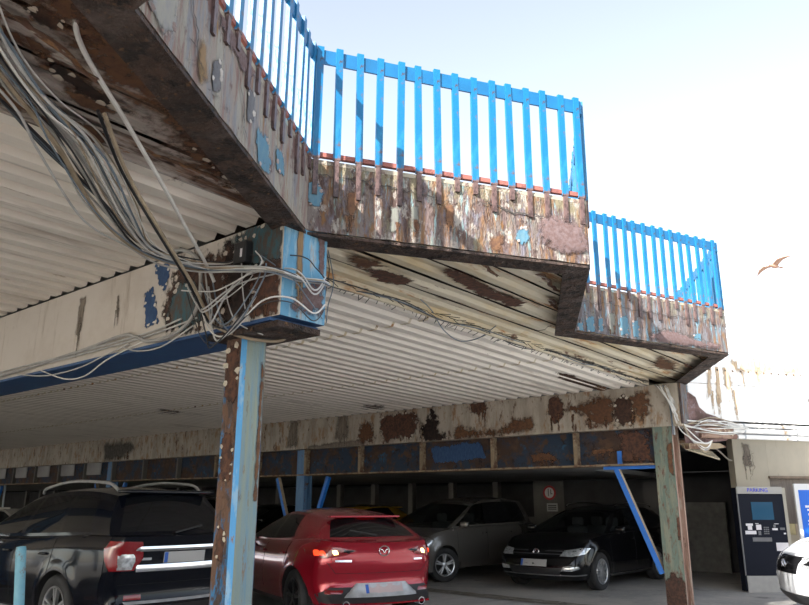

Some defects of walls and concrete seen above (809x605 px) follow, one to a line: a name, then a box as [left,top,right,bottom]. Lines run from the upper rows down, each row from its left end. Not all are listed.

corrosion [0,88,111,144]
corrosion [28,0,242,196]
peeling [247,88,284,176]
peeling [144,223,283,335]
corrosion [348,255,414,285]
corrosion [443,268,526,307]
peeling [577,316,604,332]
peeling [620,316,640,337]
corrosion [453,402,534,439]
corrosion [548,385,654,463]
peeling [219,432,234,481]
corrosion [665,573,687,605]